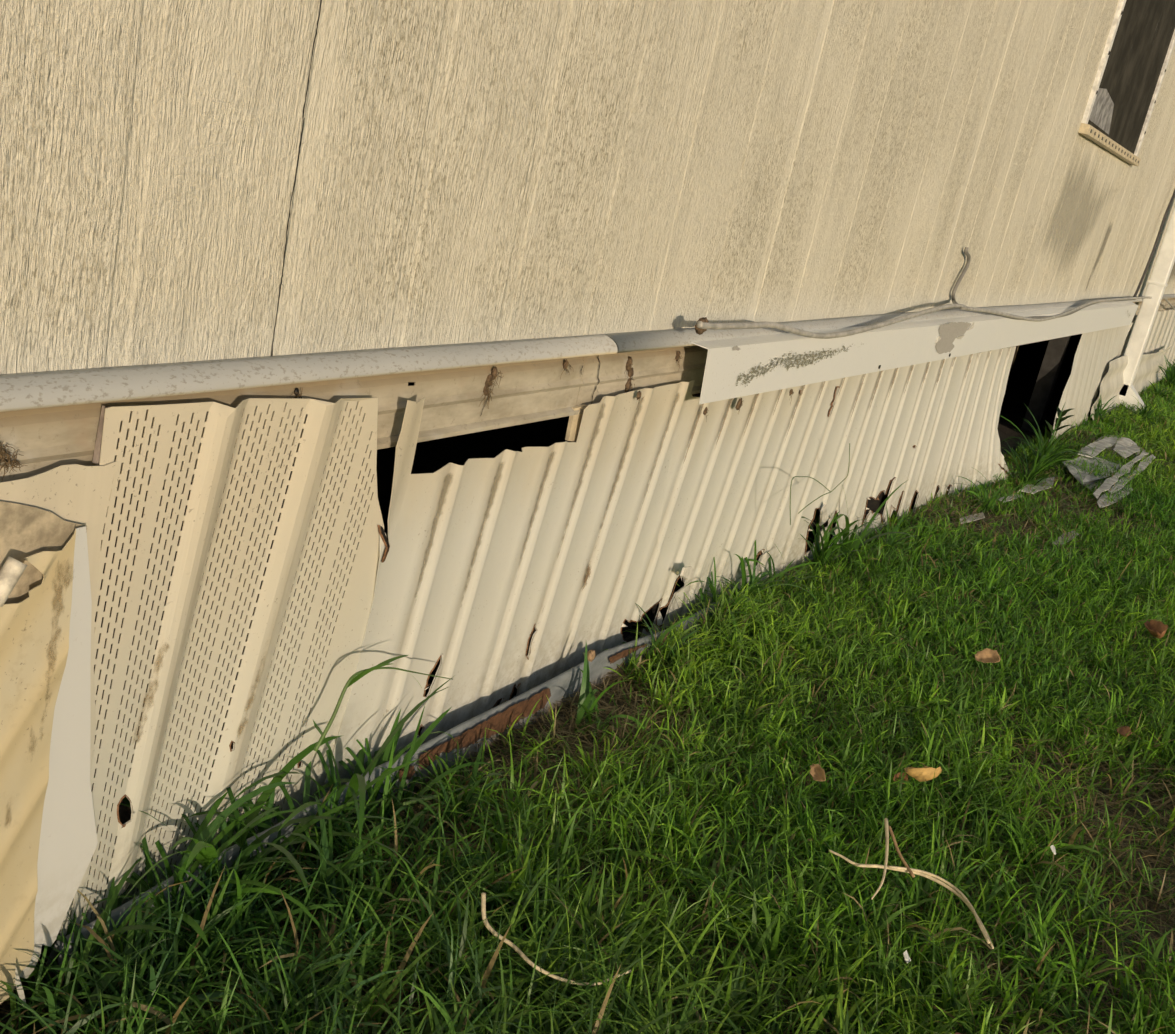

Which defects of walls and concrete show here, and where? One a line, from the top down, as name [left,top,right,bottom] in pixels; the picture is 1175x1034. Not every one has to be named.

peeling [935,322,974,354]